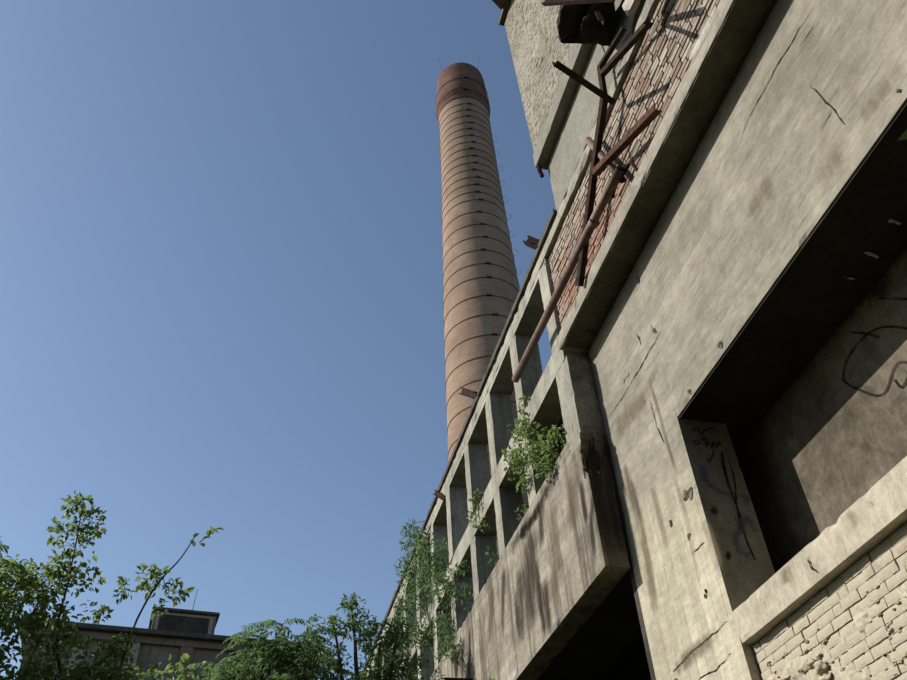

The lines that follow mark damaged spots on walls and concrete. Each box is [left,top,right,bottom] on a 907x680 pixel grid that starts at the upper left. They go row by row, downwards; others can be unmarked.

crack [742,10,812,133]
crack [810,85,844,128]
damp [512,487,559,635]
damp [569,437,654,592]
damp [453,634,470,678]